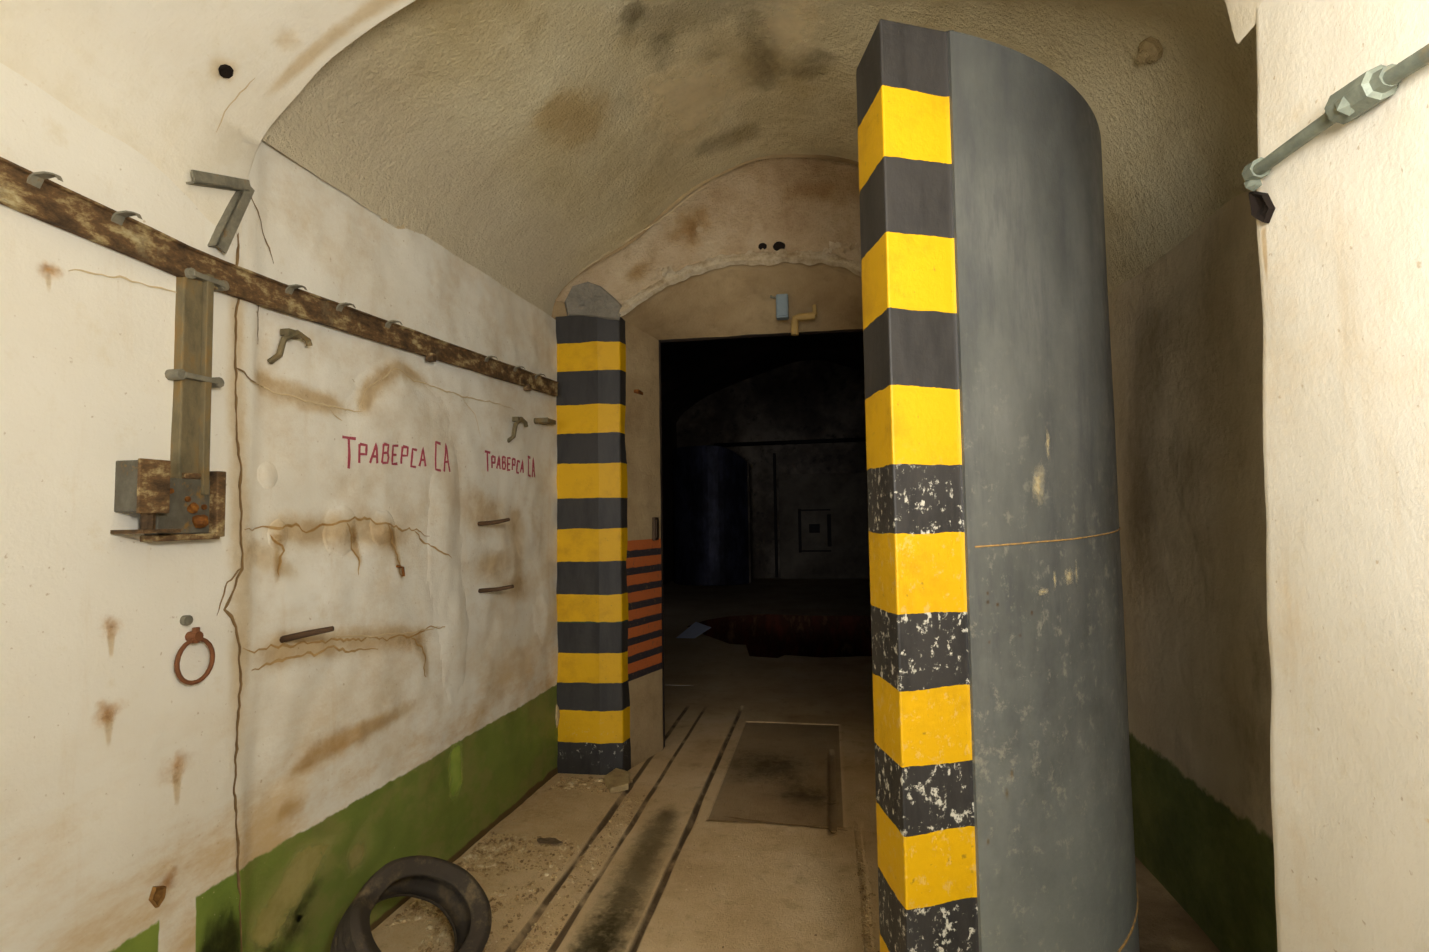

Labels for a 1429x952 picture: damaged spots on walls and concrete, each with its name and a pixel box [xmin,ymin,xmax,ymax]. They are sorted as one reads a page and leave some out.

water stain [245,516,452,577]
crack [217,198,514,952]
water stain [243,626,445,677]